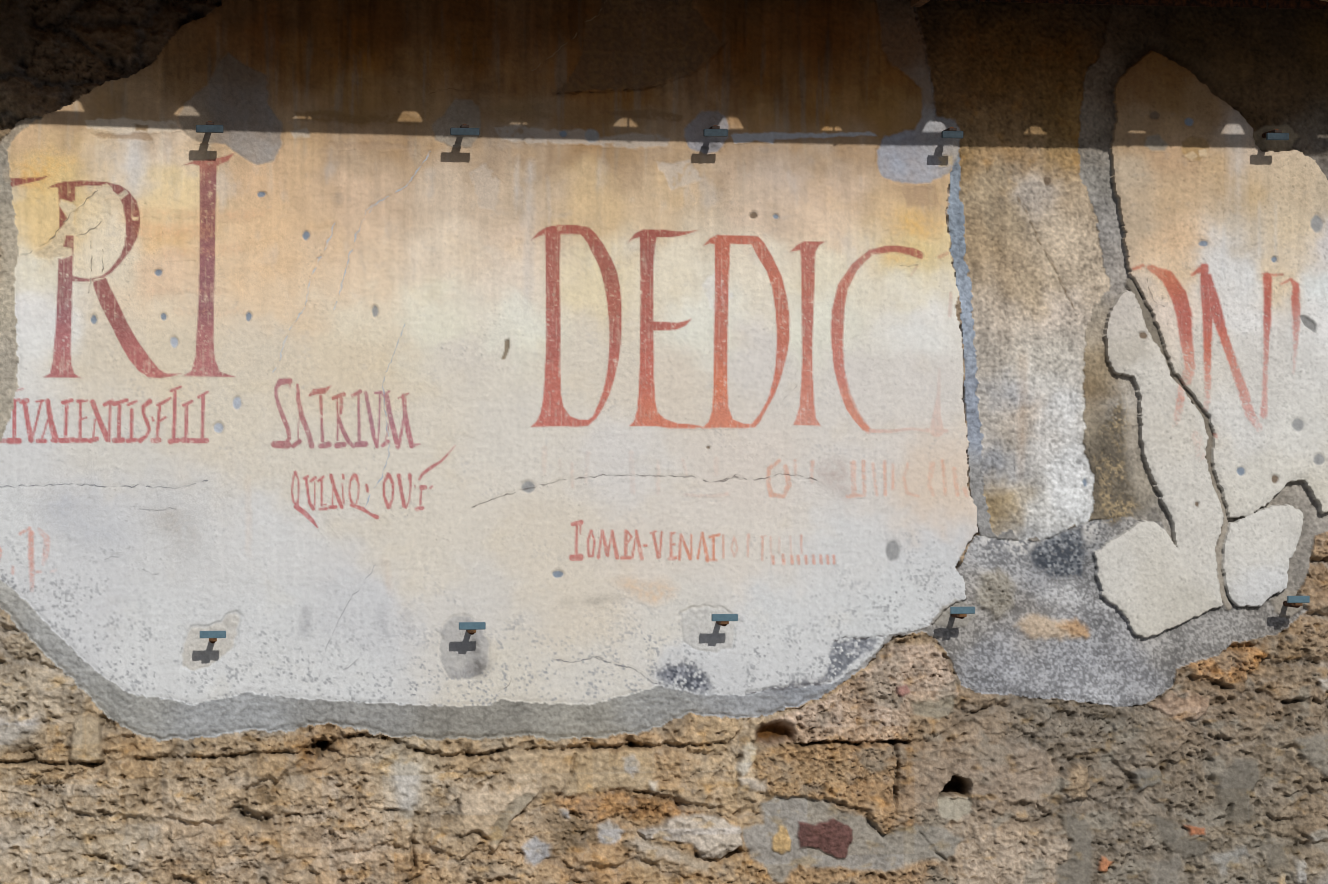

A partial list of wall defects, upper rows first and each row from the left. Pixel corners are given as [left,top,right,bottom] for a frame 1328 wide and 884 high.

crack [472,473,817,508]
crack [1124,276,1233,612]